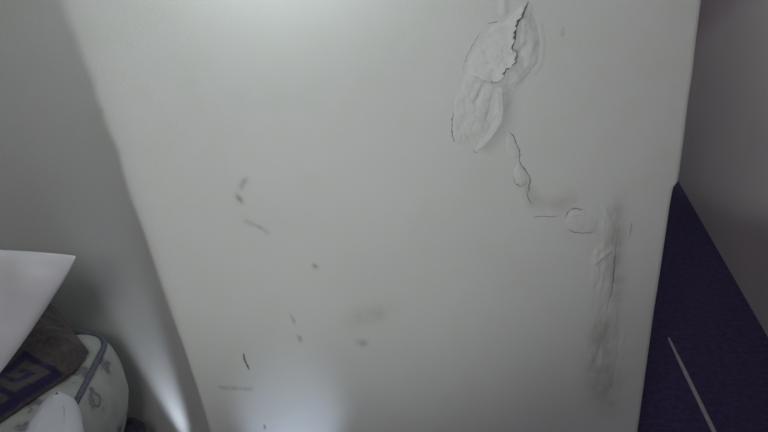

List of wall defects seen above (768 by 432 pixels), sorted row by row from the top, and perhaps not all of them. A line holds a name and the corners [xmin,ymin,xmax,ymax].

peeling [451,0,547,158]
crack [506,131,559,217]